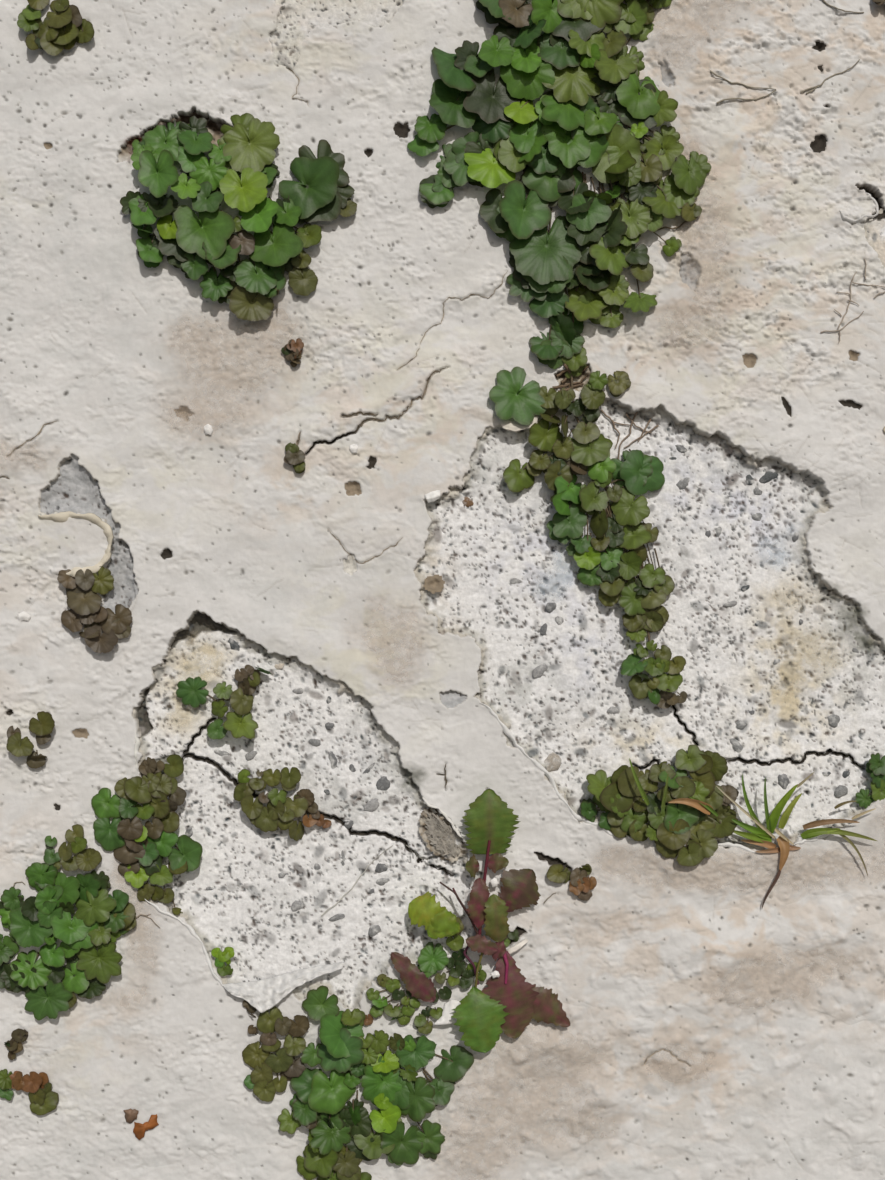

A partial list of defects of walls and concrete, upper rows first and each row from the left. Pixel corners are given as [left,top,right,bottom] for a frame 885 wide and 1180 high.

flaking render [268,0,403,71]
flaking render [839,187,885,267]
crack [296,270,508,455]
flaking render [554,365,591,391]
flaking render [38,454,139,613]
flaking render [414,400,885,853]
crack [182,718,259,797]
crack [672,705,698,746]
crack [726,749,865,767]
flaking render [133,611,498,1013]
crack [305,811,454,876]
flaking render [433,999,460,1025]